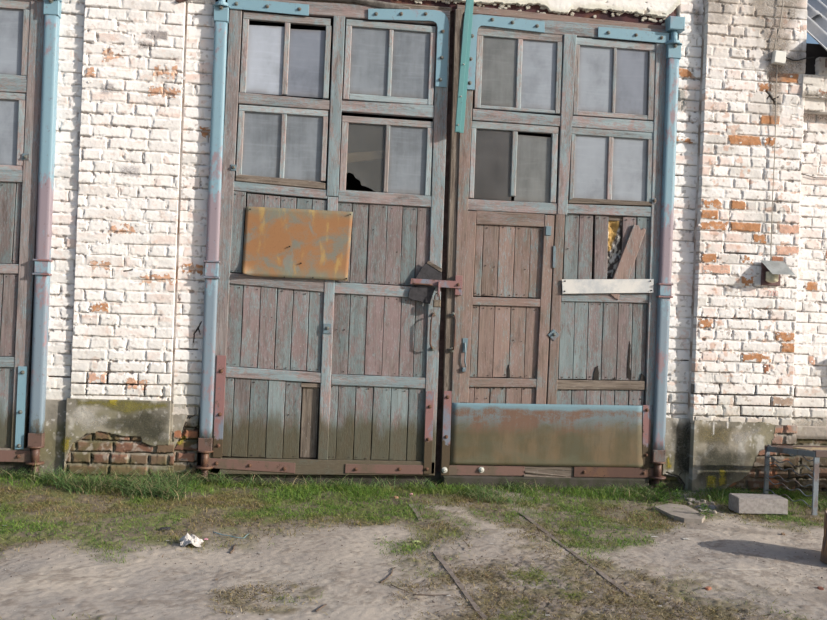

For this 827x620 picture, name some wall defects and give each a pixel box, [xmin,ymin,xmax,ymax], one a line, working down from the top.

peeling [147,64,186,98]
peeling [758,71,799,94]
peeling [759,115,780,127]
peeling [728,135,775,147]
peeling [107,223,139,234]
peeling [698,198,767,244]
peeling [139,262,205,286]
peeling [701,253,731,274]
peeling [771,245,801,261]
leakage [114,413,166,441]
flaking render [63,406,200,482]
flaking render [726,423,797,493]